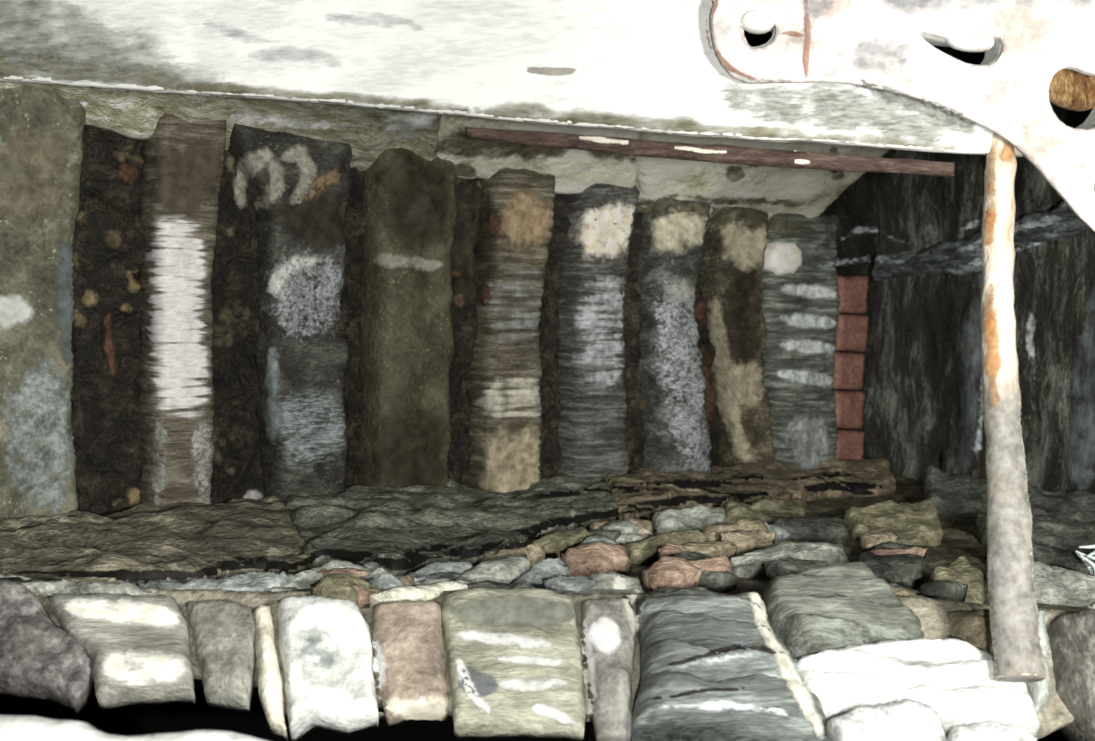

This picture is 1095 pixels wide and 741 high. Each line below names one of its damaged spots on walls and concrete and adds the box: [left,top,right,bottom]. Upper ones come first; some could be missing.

corrosion [984,143,1016,245]
corrosion [984,289,1001,408]